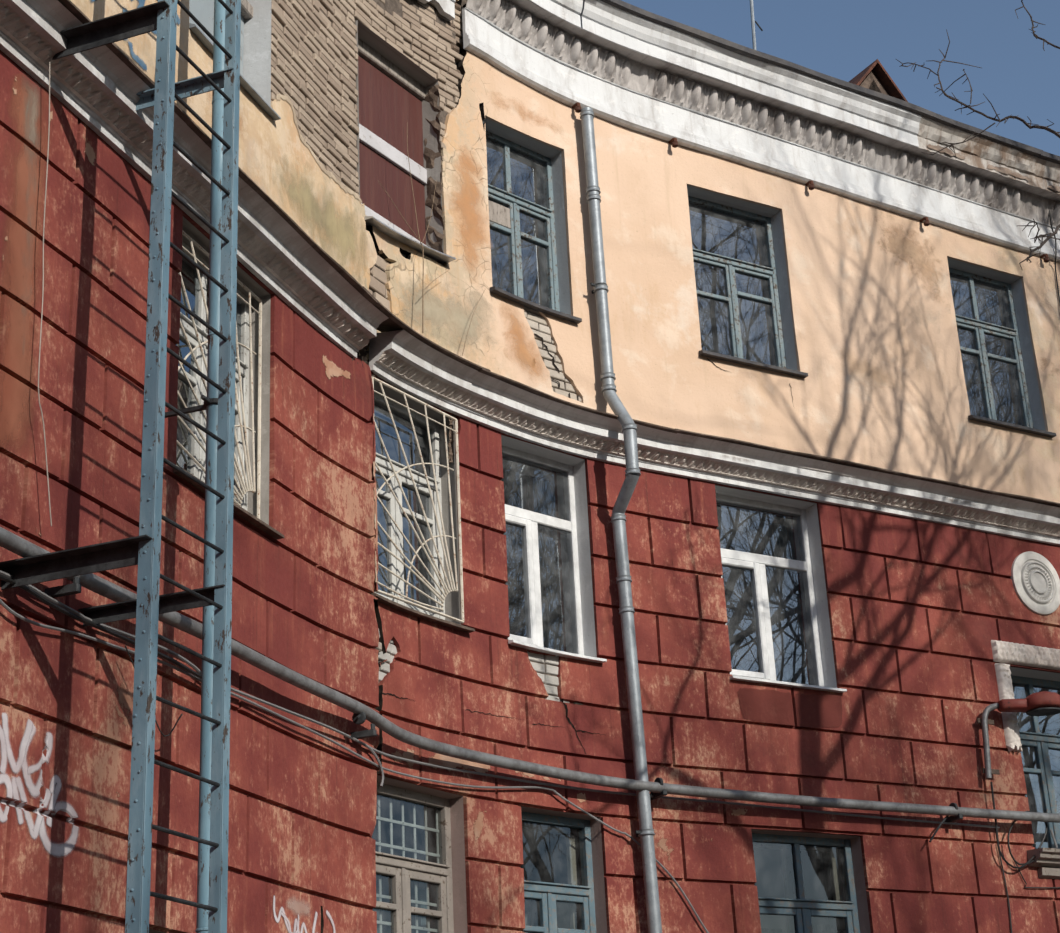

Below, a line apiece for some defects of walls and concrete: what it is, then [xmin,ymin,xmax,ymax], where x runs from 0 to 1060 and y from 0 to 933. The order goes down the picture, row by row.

crack [448,2,461,92]
flaking render [271,0,464,263]
flaking render [368,252,392,312]
flaking render [524,307,581,402]
flaking render [527,651,583,705]
crack [465,699,604,754]